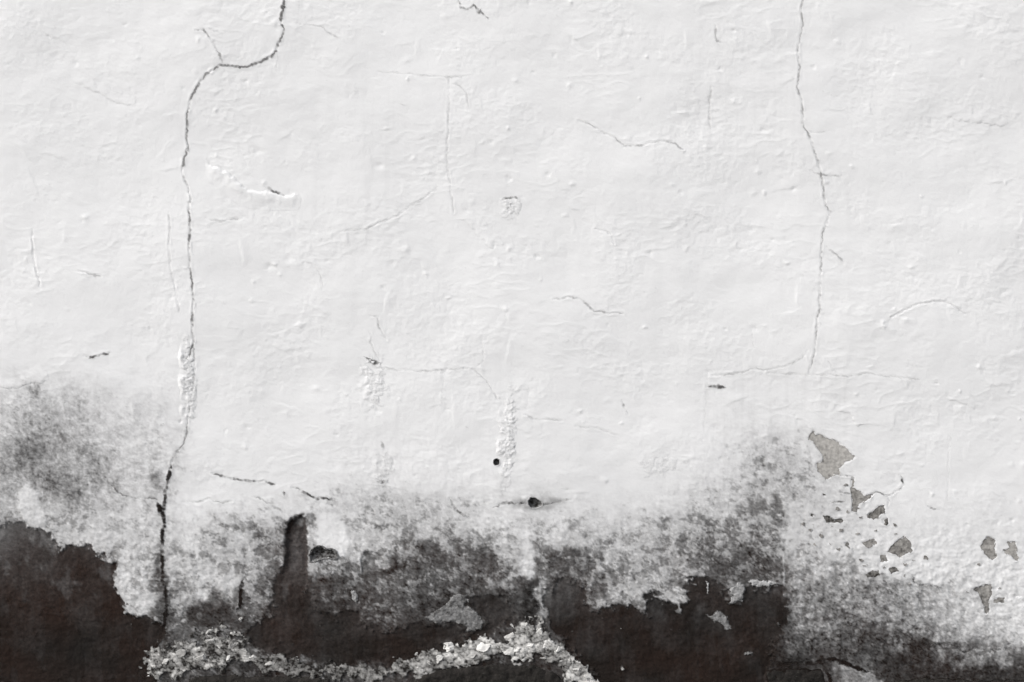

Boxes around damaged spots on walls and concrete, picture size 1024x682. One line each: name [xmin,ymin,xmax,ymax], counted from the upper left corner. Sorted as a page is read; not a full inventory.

crack [183,0,285,166]
water stain [0,415,115,509]
water stain [0,522,170,682]
crack [151,466,172,644]
spalling [138,594,600,682]
water stain [247,517,519,670]
water stain [542,576,791,682]
water stain [716,457,796,529]
peeling [801,431,928,585]
water stain [894,631,1024,682]
peeling [966,583,1004,615]
peeling [977,535,1019,566]